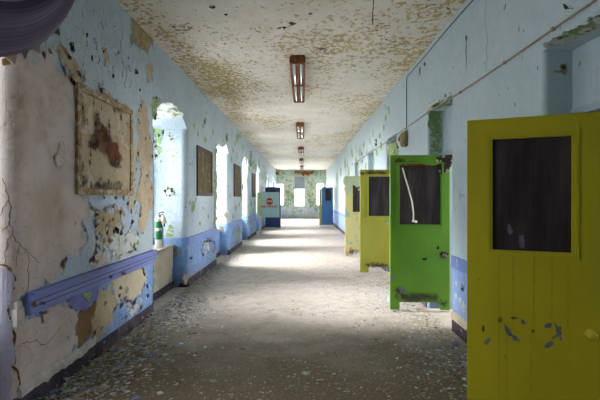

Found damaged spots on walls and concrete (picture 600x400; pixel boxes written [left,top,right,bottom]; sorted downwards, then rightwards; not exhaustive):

peeling [542,15,600,48]
peeling [126,0,272,245]
peeling [426,91,452,175]
crack [0,178,40,291]
flaking render [0,0,184,400]
crack [7,307,61,392]